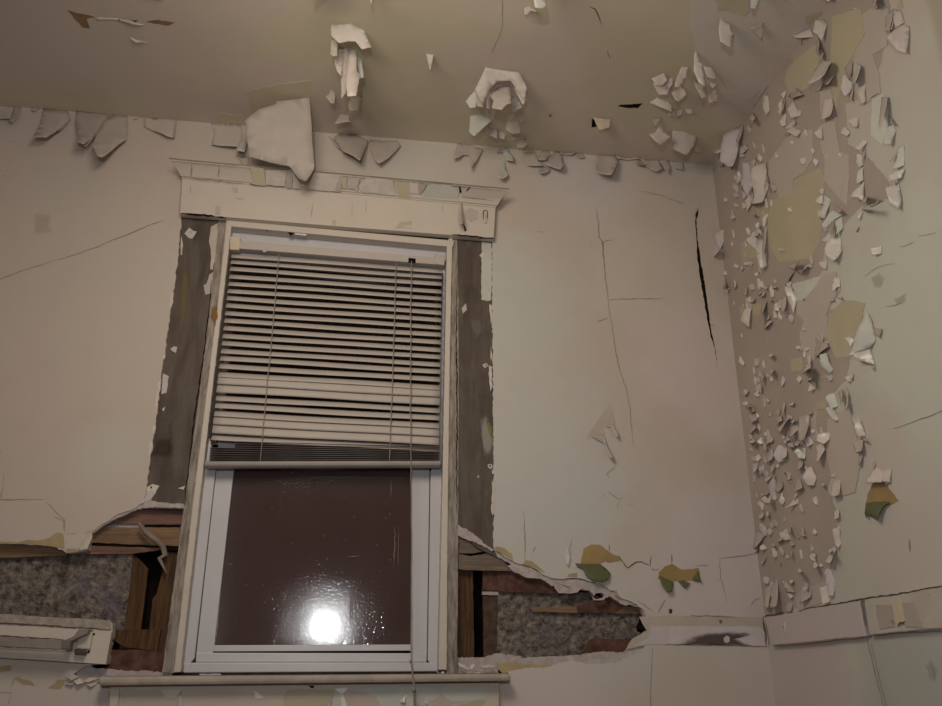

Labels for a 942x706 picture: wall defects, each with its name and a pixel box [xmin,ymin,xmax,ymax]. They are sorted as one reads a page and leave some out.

peeling [75,111,177,157]
crack [1,157,289,279]
peeling [204,206,221,295]
peeling [211,23,503,231]
crack [318,172,504,209]
peeling [479,241,492,324]
peeling [466,67,528,148]
crack [643,191,717,366]
peeling [618,0,910,633]
peeling [148,374,169,456]
flaking render [0,484,184,689]
flaking render [283,525,654,706]